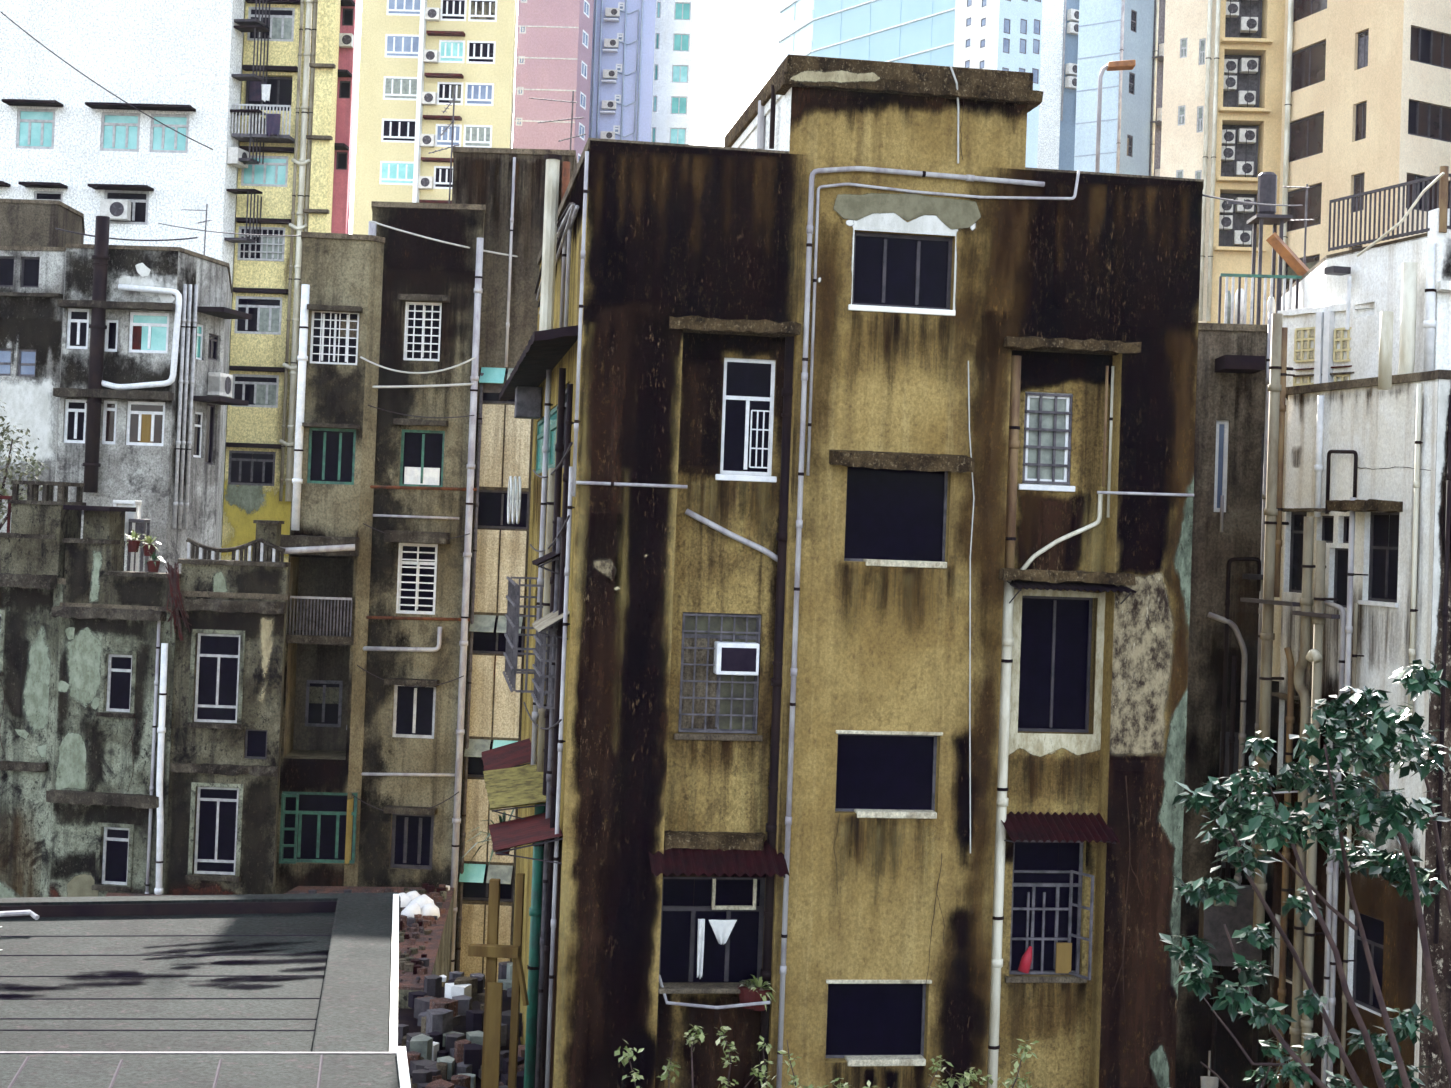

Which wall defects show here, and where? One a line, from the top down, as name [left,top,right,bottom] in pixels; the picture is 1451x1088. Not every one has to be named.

water stain [621,153,706,237]
water stain [724,153,802,251]
water stain [1442,246,1451,279]
water stain [0,249,197,499]
water stain [1220,373,1252,485]
peeling [225,485,265,514]
peeling [593,559,620,590]
water stain [792,168,1208,1088]
water stain [1213,538,1260,681]
peeling [15,627,102,758]
water stain [549,302,796,1088]
peeling [0,882,17,898]